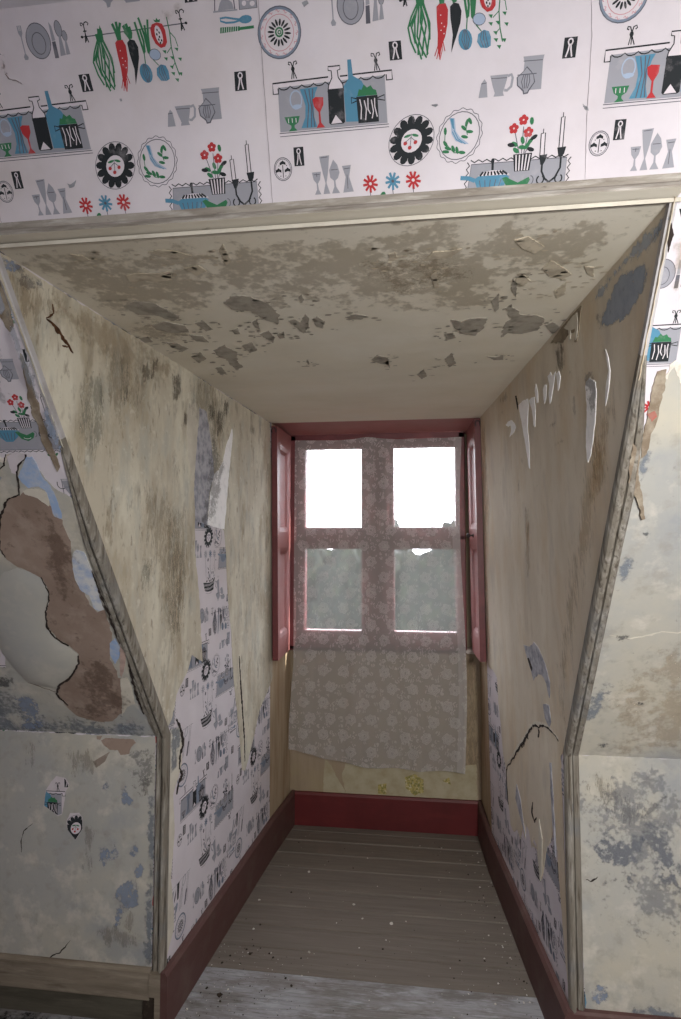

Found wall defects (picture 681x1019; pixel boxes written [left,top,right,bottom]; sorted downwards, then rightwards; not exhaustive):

peeling [20,353,60,472]
crack [46,304,73,353]
peeling [106,244,381,375]
peeling [371,355,397,370]
peeling [408,353,456,379]
peeling [506,371,561,468]
peeling [585,349,611,462]
peeling [641,369,667,459]
flaking render [0,452,135,722]
peeling [524,642,551,727]
flaking render [93,736,136,767]
crack [506,721,559,805]